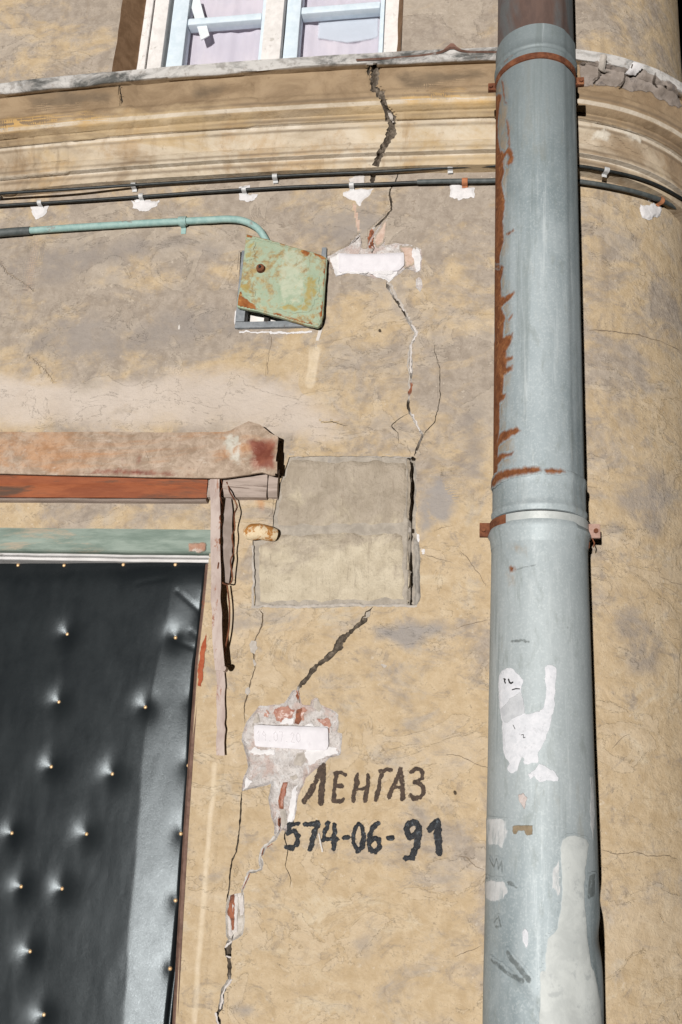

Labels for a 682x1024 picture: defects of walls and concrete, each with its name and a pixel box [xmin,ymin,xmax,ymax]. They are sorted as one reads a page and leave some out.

flaking render [625,62,643,76]
crack [349,64,398,253]
flaking render [327,220,423,291]
crack [386,281,441,456]
crack [244,610,263,719]
crack [296,607,373,702]
flaking render [242,690,342,835]
crack [226,794,291,902]
flaking render [225,892,245,942]
crack [215,935,233,1024]